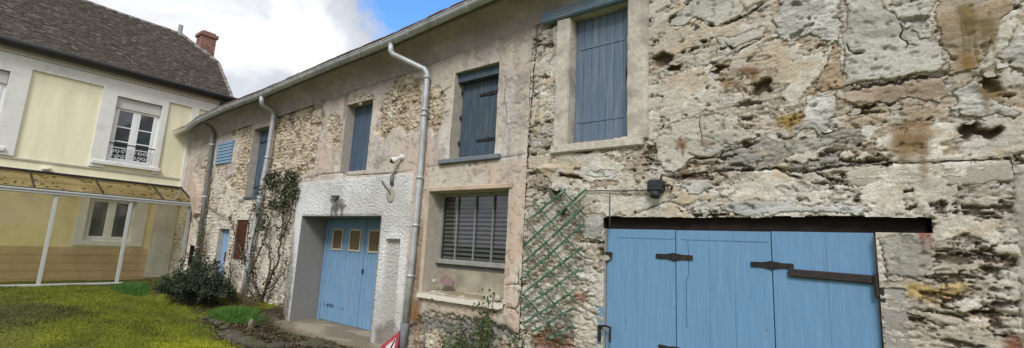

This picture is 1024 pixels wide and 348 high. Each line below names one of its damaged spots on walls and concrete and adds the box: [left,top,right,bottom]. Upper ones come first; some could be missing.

spalling [266,74,448,182]
crack [501,34,538,173]
corrosion [779,115,801,134]
peeling [771,0,1024,140]
corrosion [891,123,927,161]